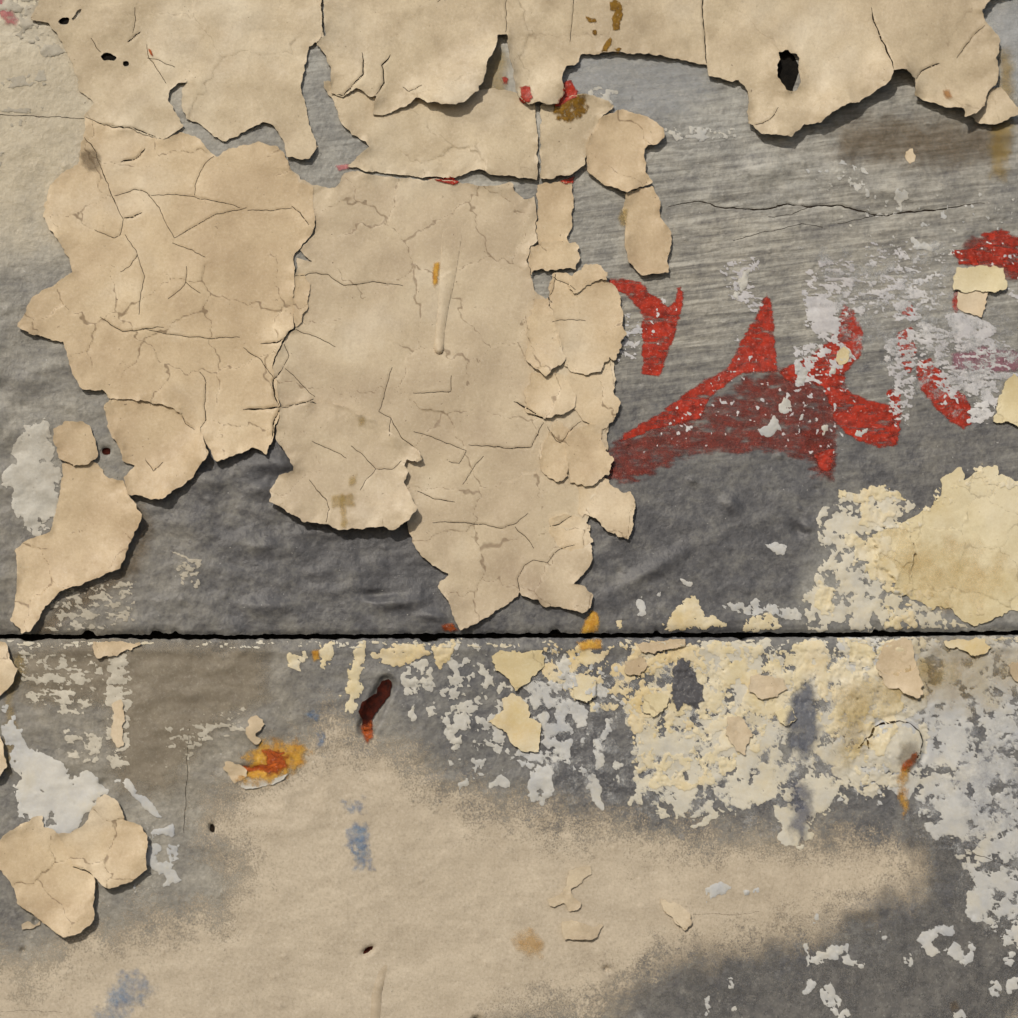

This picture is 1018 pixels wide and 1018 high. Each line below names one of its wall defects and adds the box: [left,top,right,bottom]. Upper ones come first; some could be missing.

crack [669,201,985,241]
peeling [0,0,1018,715]
peeling [0,641,181,937]
peeling [169,715,265,745]
peeling [223,761,287,789]
corrosion [242,741,305,783]
corrosion [358,679,392,742]
peeling [345,465,1018,997]